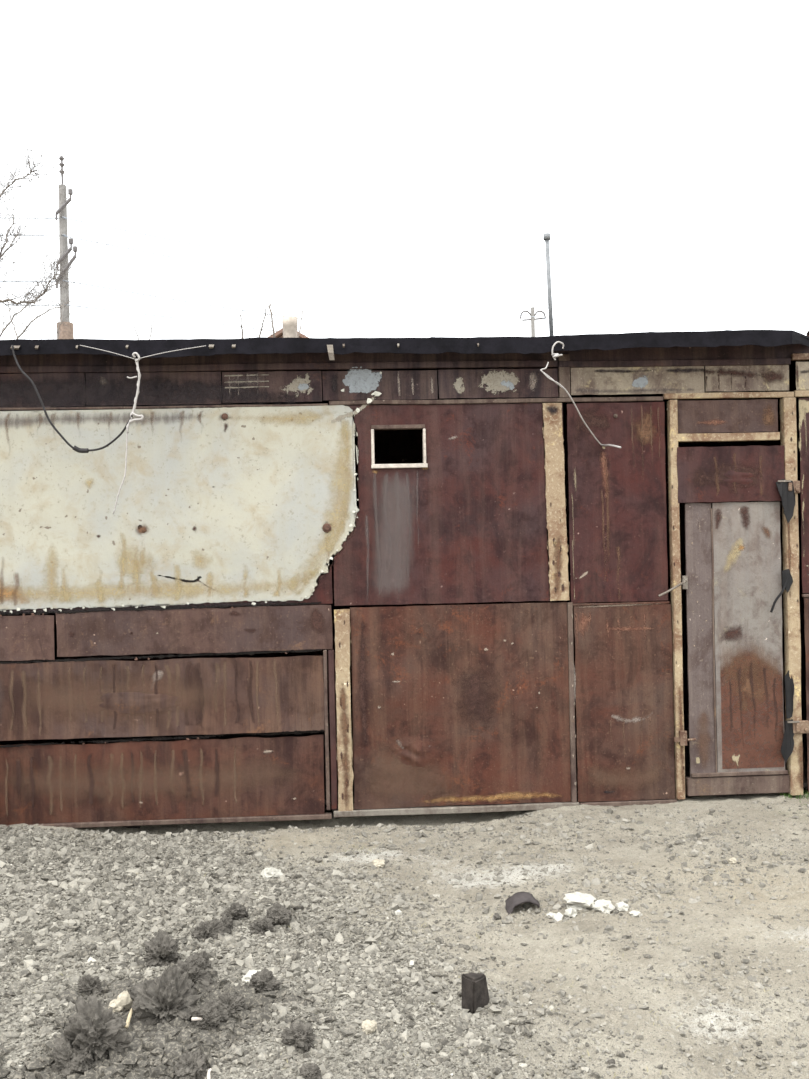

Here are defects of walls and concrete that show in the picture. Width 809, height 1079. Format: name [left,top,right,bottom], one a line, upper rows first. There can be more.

rust [0,378,294,408]
peeling [224,373,313,398]
peeling [453,377,465,393]
peeling [478,369,536,395]
peeling [799,400,809,461]
peeling [329,367,382,560]
peeling [0,601,290,613]
rust [0,602,324,633]
rust [0,649,324,748]
rust [340,624,368,803]
rust [720,653,784,769]
rust [433,793,551,801]